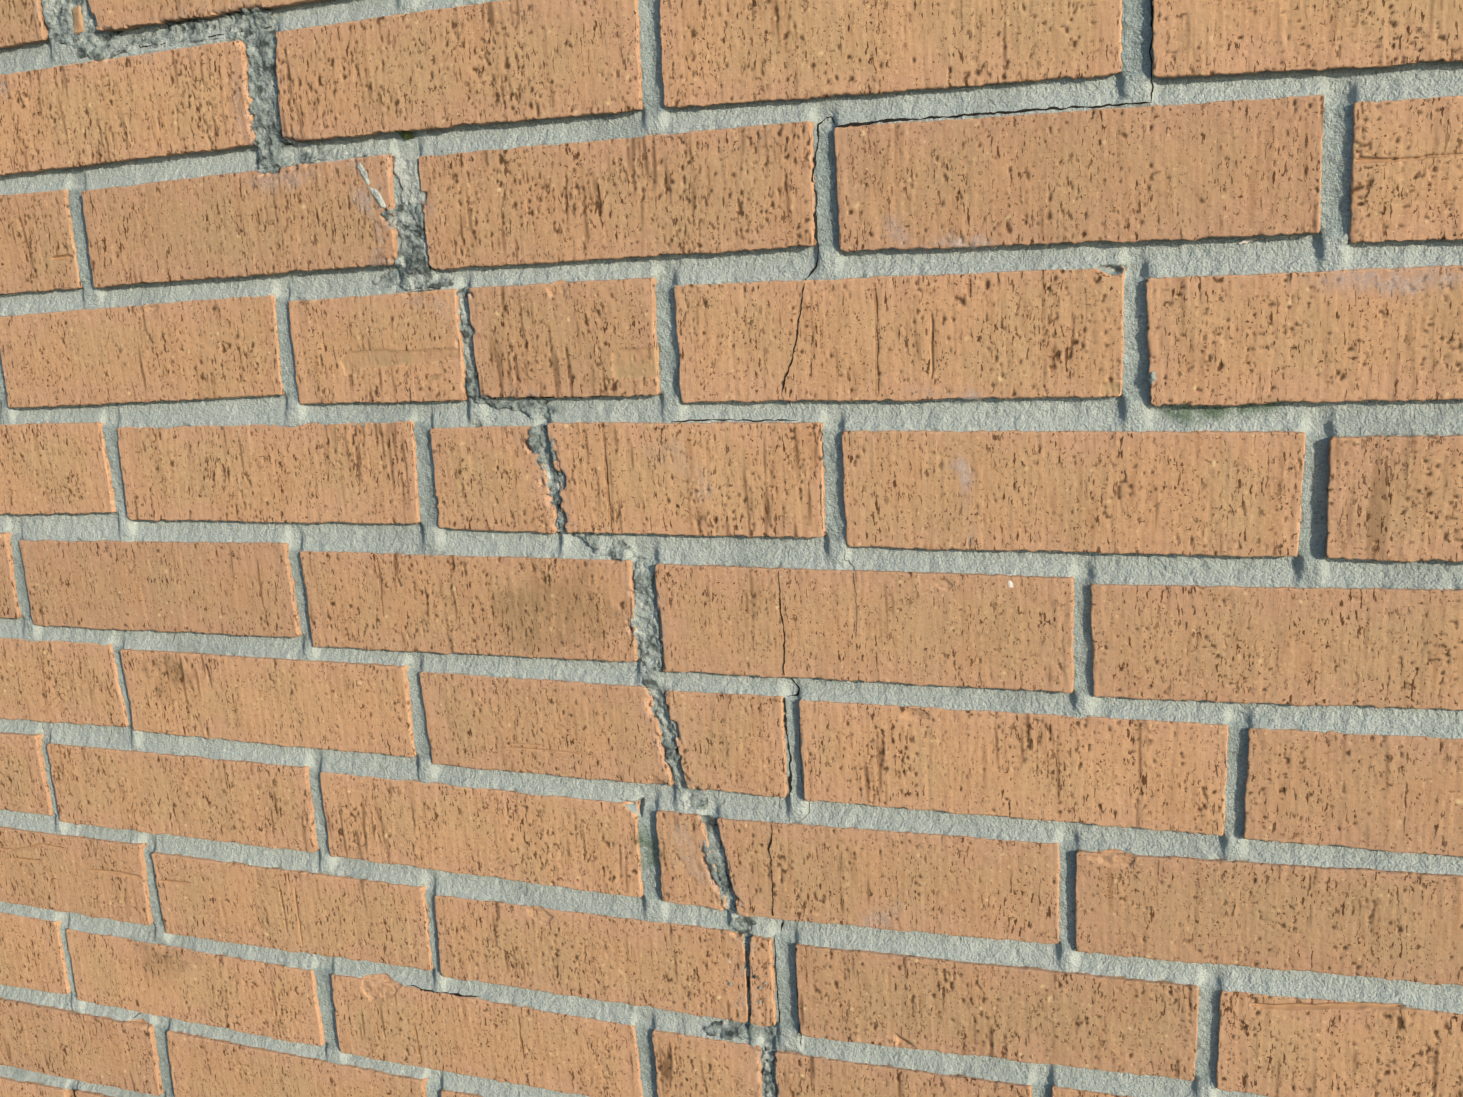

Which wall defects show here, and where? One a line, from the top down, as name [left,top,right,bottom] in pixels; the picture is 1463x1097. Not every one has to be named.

crack [41,0,810,1097]
crack [671,0,1154,632]